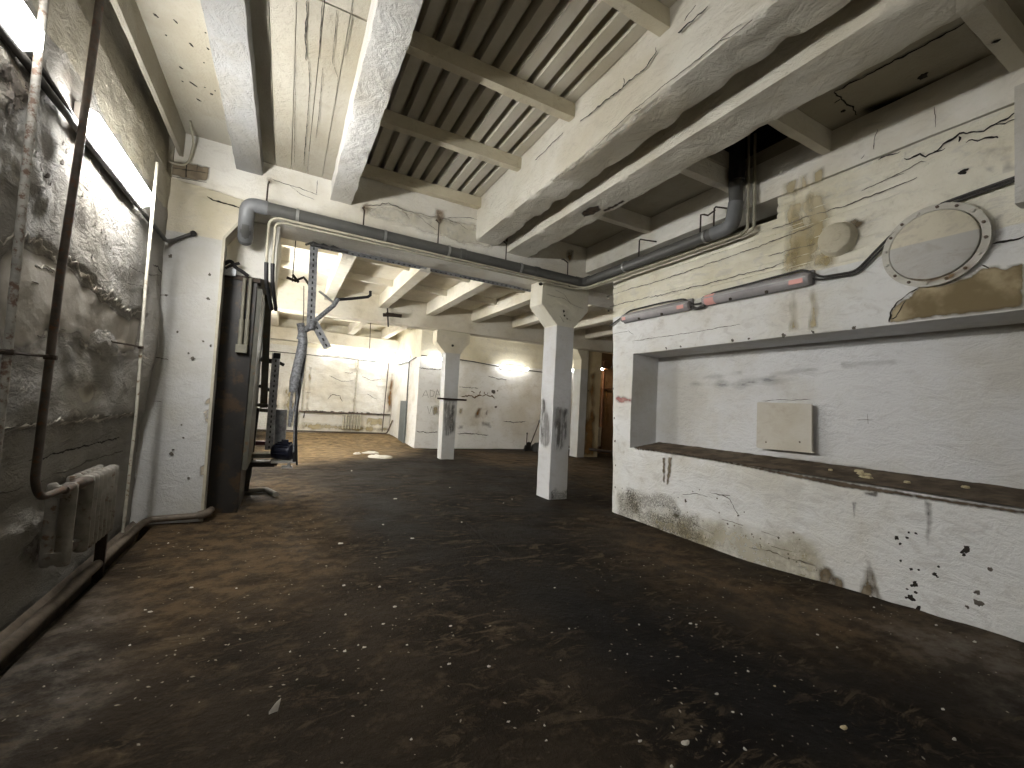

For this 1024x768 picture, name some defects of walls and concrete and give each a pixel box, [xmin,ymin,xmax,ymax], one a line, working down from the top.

spalling [1,57,30,116]
crack [274,1,353,199]
crack [834,22,965,115]
crack [364,203,477,230]
damp [786,170,830,269]
crack [610,107,1014,307]
flaking render [0,231,142,353]
flaking render [888,264,1023,322]